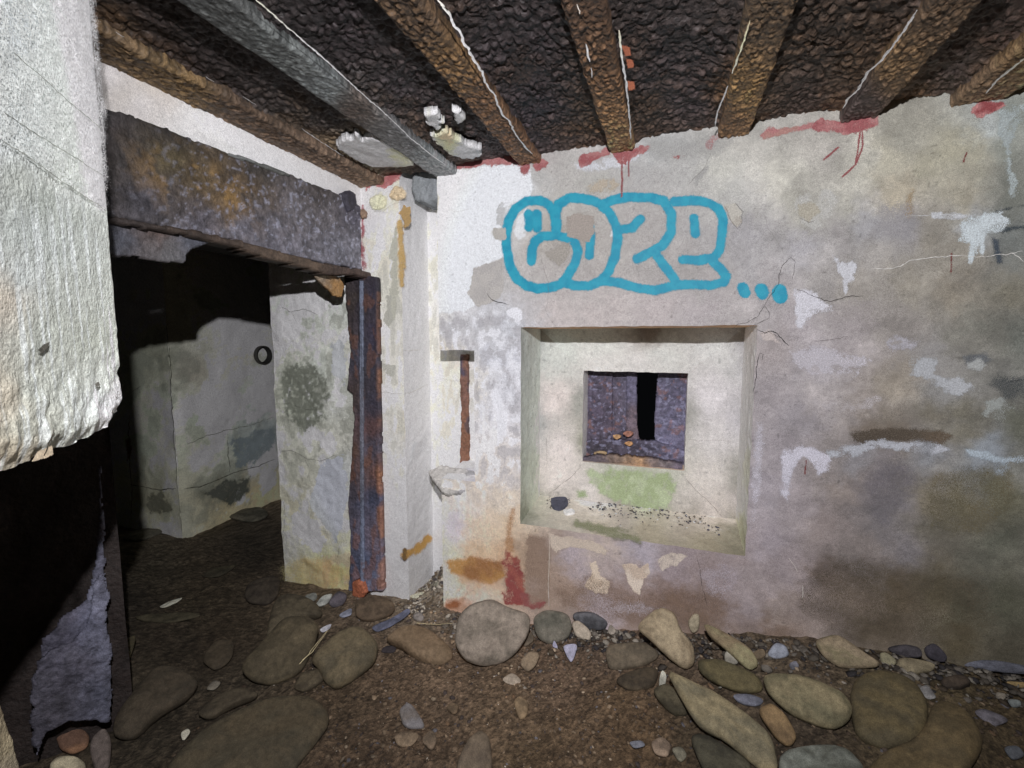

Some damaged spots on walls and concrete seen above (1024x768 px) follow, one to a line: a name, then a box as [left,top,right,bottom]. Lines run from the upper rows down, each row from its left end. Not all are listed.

damp [868,104,1024,264]
crack [737,215,859,391]
crack [130,348,334,490]
damp [274,357,333,435]
rust [460,354,470,463]
rust [613,431,634,446]
rust [399,534,432,561]
rust [444,509,517,587]
spalling [622,553,688,595]